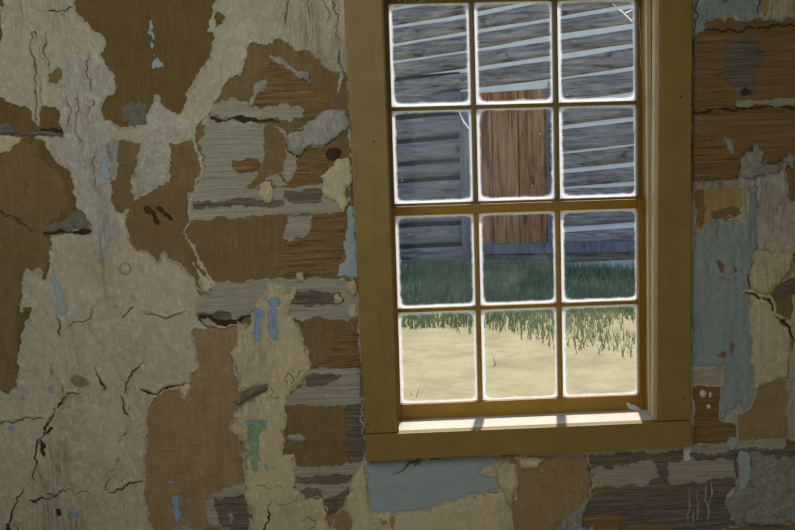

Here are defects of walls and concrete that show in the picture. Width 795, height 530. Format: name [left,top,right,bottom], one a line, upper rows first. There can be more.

flaking render [46,65,64,88]
crack [280,0,346,93]
flaking render [0,93,93,396]
flaking render [72,0,366,530]
flaking render [691,180,745,232]
flaking render [683,251,795,461]
crack [740,274,795,353]
crack [0,362,192,530]
flaking render [494,452,595,530]